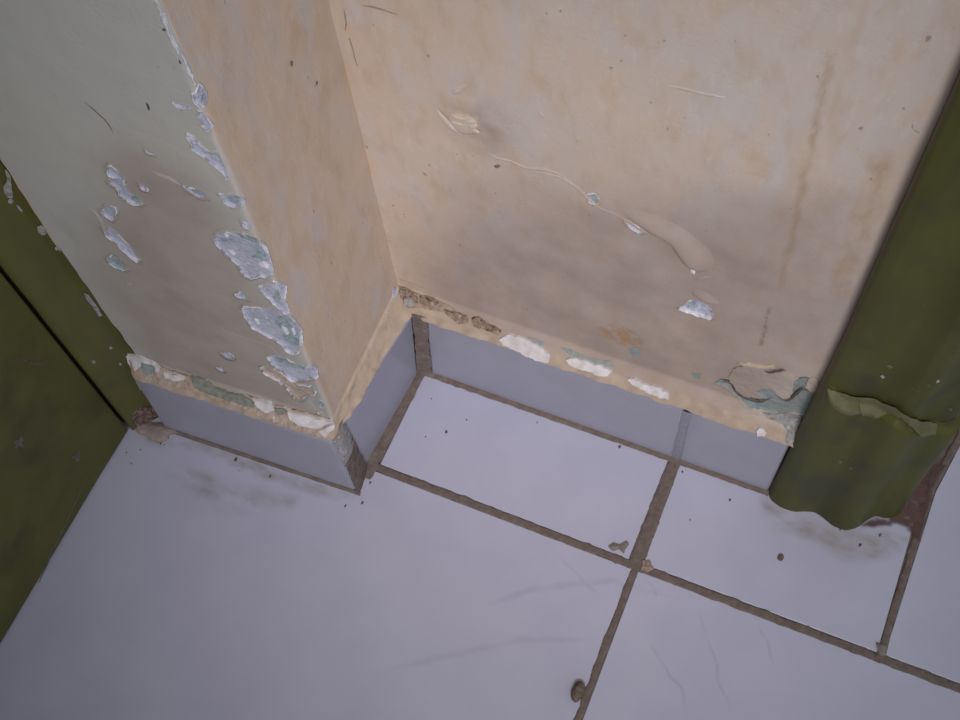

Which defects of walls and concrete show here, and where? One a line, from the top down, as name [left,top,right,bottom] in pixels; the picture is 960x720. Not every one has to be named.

peeling [152,0,232,180]
peeling [99,164,150,271]
flaking render [119,184,335,439]
flaking render [392,284,502,335]
peeling [677,289,720,320]
flaking render [714,362,819,443]